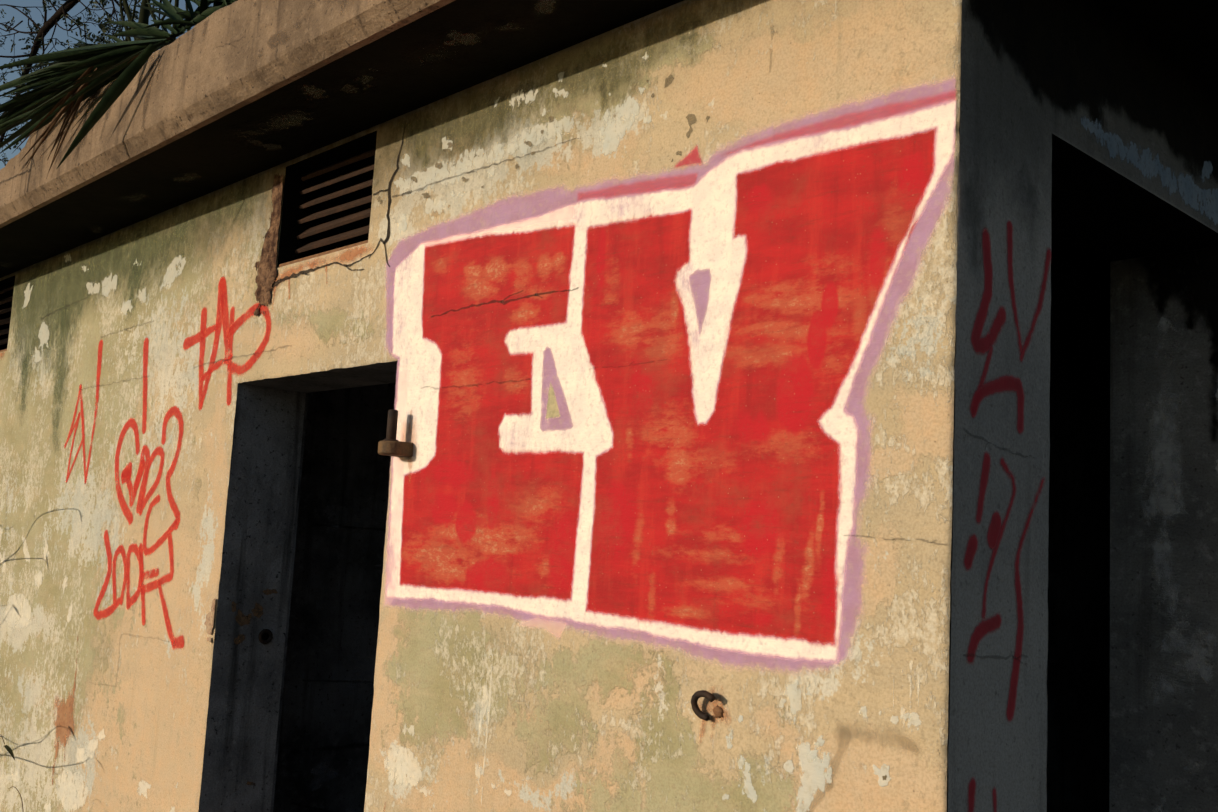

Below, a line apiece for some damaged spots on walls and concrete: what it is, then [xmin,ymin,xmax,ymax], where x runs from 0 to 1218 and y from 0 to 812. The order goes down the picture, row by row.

peeling [394,89,574,217]
peeling [599,74,674,155]
peeling [686,114,710,138]
peeling [22,283,33,309]
peeling [64,254,186,315]
spalling [254,174,284,317]
crack [272,127,405,288]
water stain [21,356,30,408]
peeling [32,321,49,364]
water stain [53,303,70,432]
rust [52,659,77,785]
peeling [783,736,832,812]